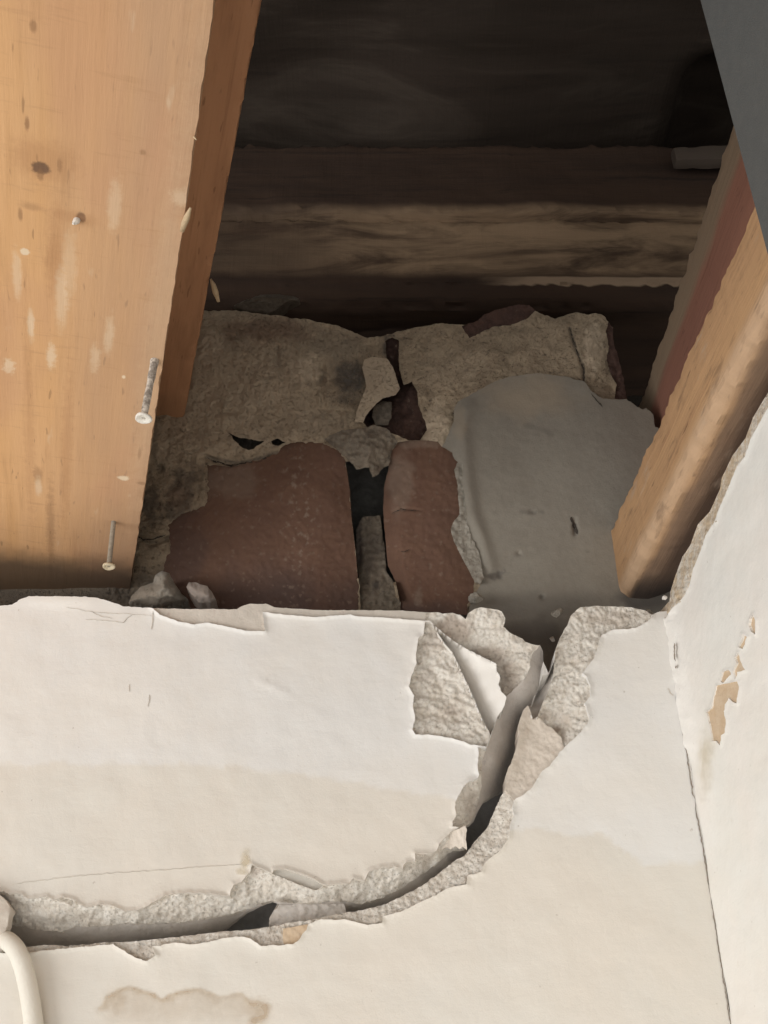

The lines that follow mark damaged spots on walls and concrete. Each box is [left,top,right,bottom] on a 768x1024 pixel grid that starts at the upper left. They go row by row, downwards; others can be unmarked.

crack [67,607,153,629]
flaking render [153,373,768,800]
crack [0,646,543,961]